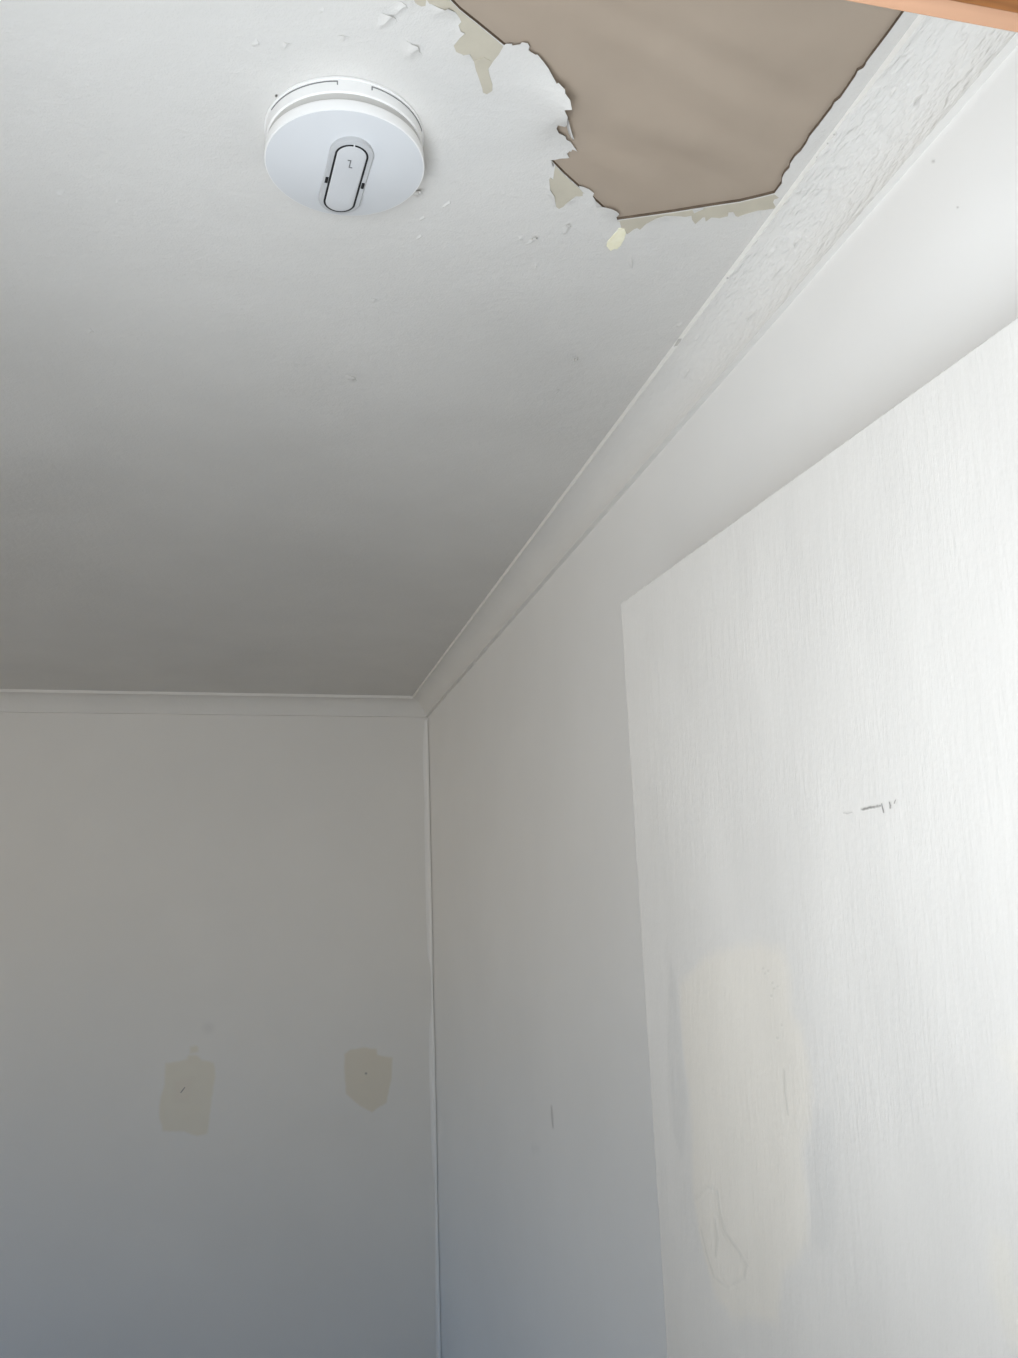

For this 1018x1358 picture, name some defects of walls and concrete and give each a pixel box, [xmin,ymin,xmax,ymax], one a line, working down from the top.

peeling [397,0,781,251]